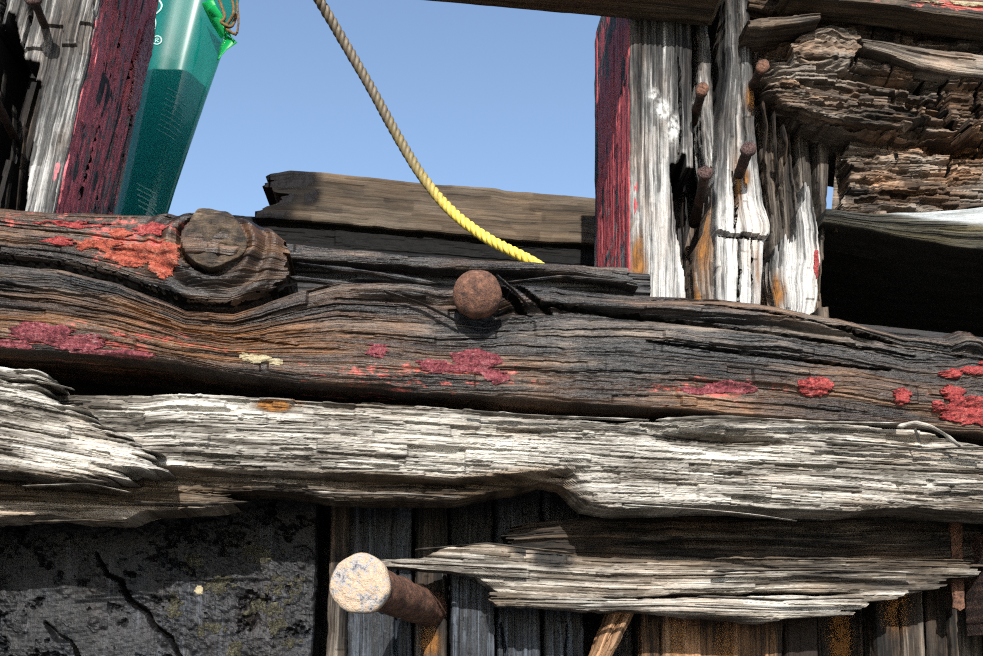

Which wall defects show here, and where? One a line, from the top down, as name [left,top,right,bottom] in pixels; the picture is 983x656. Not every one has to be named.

peeling [921,0,983,8]
peeling [127,16,156,117]
rust [734,171,748,204]
peeling [32,220,182,280]
peeling [364,343,389,358]
peeling [415,349,510,385]
peeling [680,380,758,395]
peeling [797,377,834,397]
peeling [931,361,983,427]
crack [95,554,183,656]